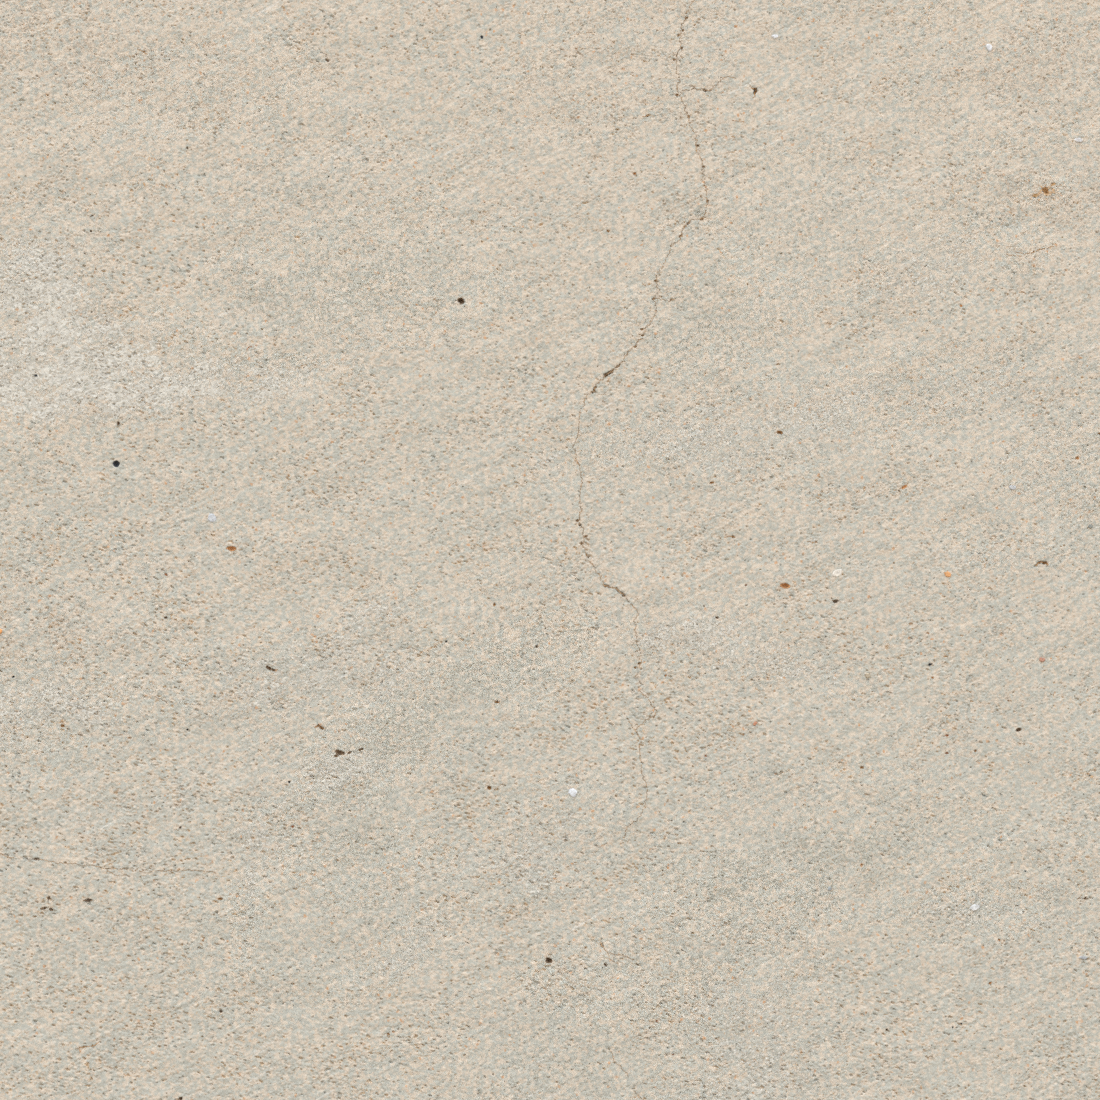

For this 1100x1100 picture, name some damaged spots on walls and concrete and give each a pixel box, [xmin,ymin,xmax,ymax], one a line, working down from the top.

crack [572,1,736,838]